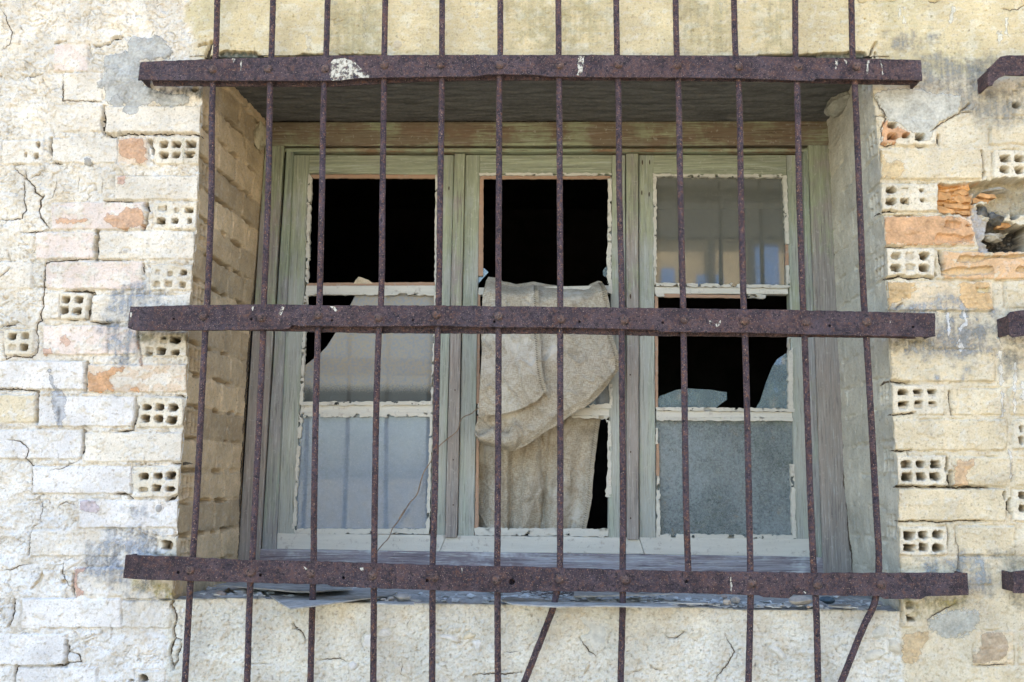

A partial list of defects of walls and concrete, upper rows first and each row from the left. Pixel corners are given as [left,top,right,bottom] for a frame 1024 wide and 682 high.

crack [5,164,103,233]
peeling [104,207,146,231]
spalling [883,176,1024,311]
peeling [973,633,1009,664]